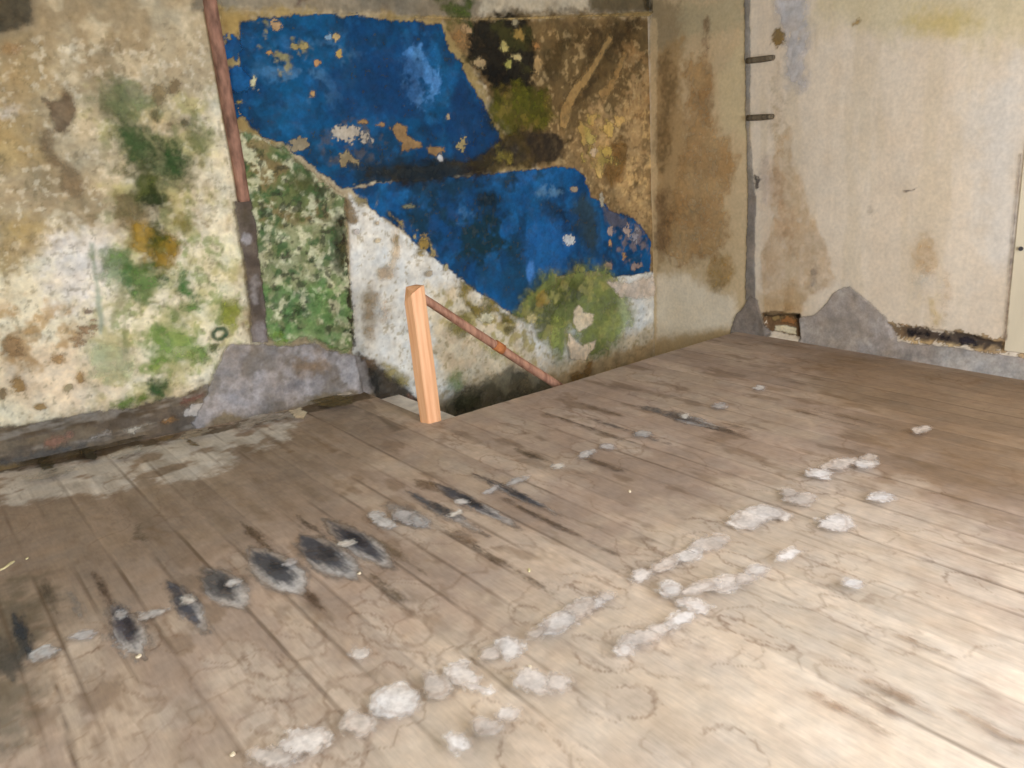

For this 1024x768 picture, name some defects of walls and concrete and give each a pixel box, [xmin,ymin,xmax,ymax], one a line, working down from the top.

peeling [223,13,656,314]
damp [657,58,735,289]
flaking render [762,311,801,338]